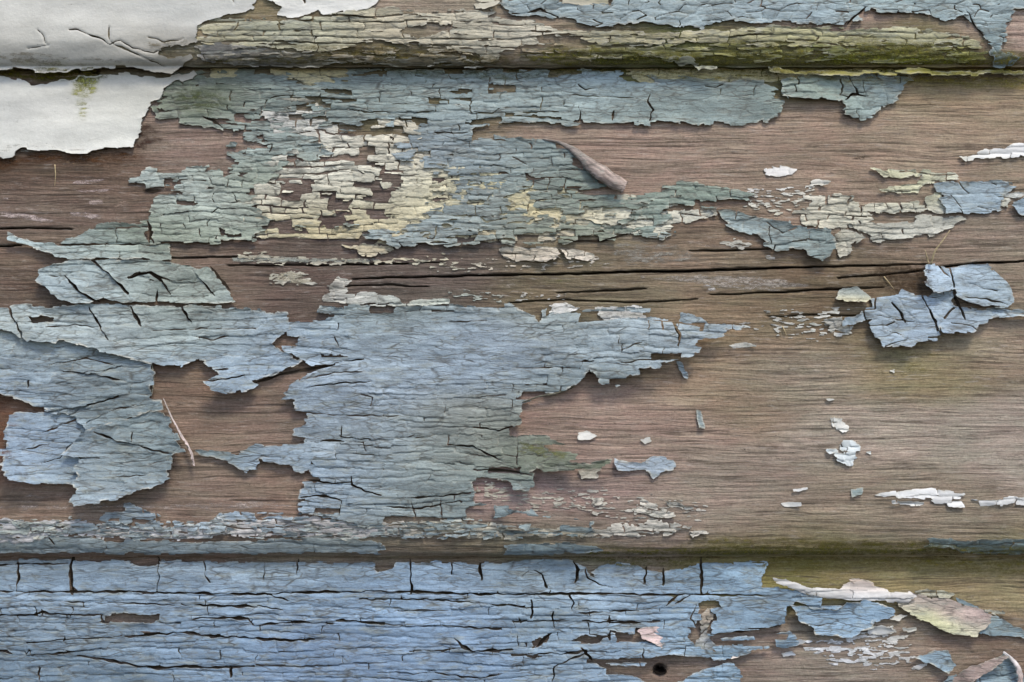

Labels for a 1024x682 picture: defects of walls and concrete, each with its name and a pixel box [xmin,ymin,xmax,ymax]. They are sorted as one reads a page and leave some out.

leakage [443,40,1024,89]
peeling [0,0,1024,262]
crack [197,249,1022,316]
peeling [764,263,1024,347]
peeling [0,222,750,556]
peeling [826,417,871,466]
peeling [781,487,808,507]
peeling [876,488,1024,508]
peeling [924,537,1024,555]
peeling [0,556,1024,682]